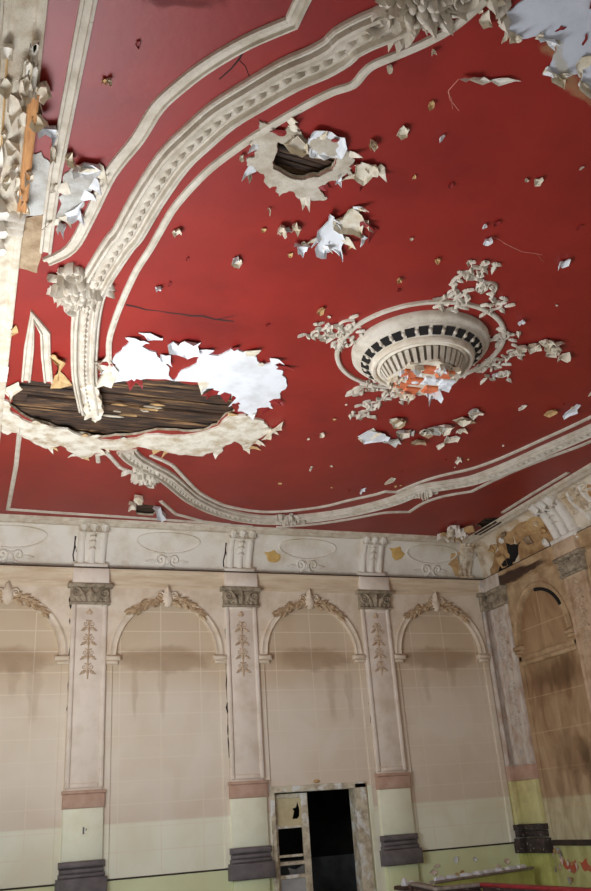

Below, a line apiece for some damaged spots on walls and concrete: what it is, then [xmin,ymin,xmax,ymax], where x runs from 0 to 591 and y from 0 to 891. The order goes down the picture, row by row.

peeling [478,0,591,99]
spalling [0,40,108,273]
spalling [239,117,387,212]
peeling [397,125,409,140]
peeling [277,206,379,262]
peeling [482,221,501,246]
spalling [1,333,295,461]
spalling [358,408,484,450]
spalling [387,359,462,405]
peeling [544,404,581,420]
spalling [437,516,559,579]